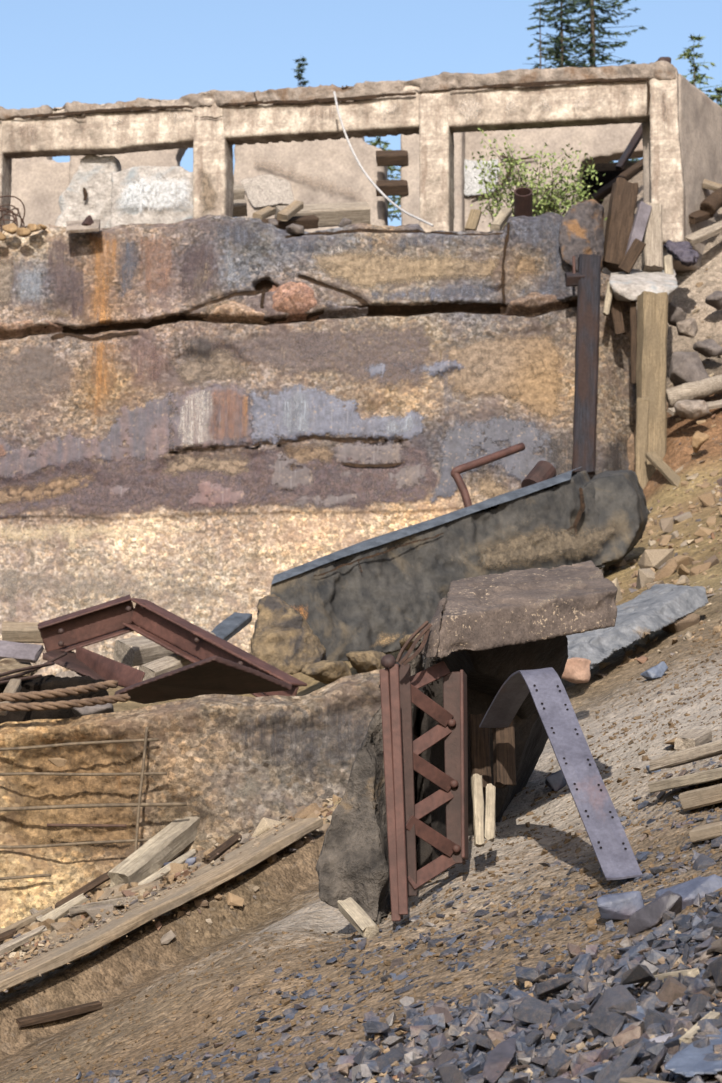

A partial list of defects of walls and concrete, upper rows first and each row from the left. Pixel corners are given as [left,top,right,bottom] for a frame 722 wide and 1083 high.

crack [10,222,510,341]
crack [534,300,577,317]
spalling [0,335,560,522]